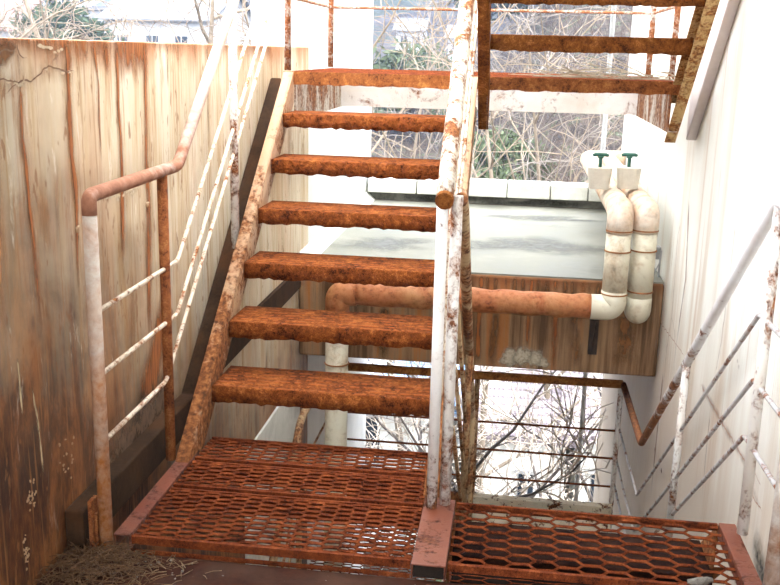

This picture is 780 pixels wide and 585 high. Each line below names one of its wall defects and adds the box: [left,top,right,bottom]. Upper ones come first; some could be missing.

corrosion [20,90,48,302]
crack [0,39,76,94]
corrosion [0,38,149,268]
corrosion [141,183,162,400]